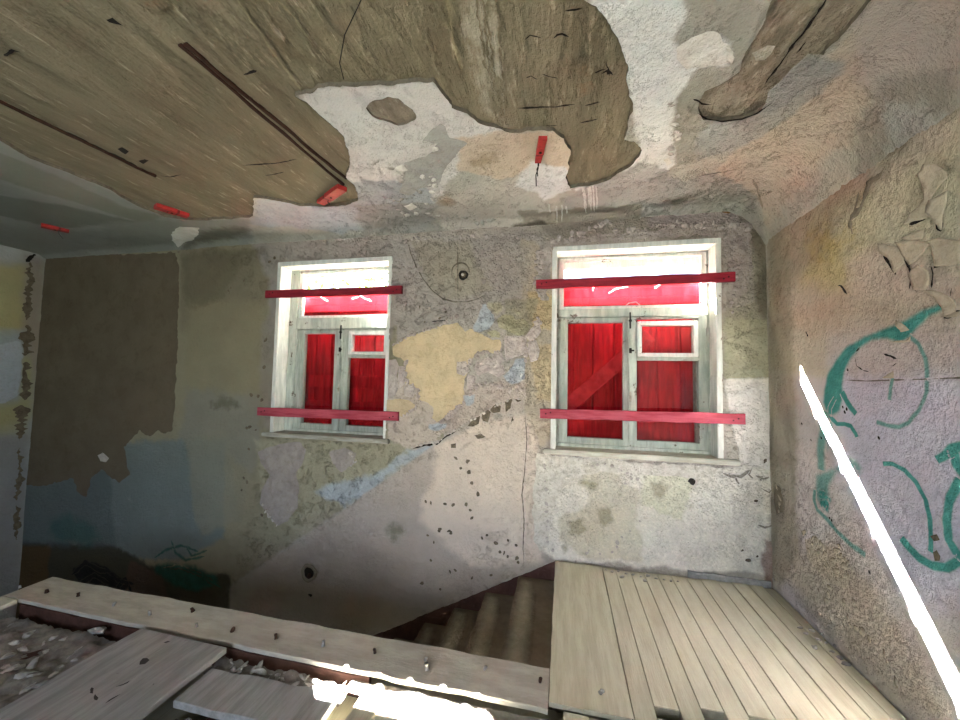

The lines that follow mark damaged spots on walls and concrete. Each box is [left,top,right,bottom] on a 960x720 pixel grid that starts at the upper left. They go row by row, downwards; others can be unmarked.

spalling [676,0,871,121]
spalling [0,0,642,540]
peeling [877,156,960,319]
crack [520,418,528,564]